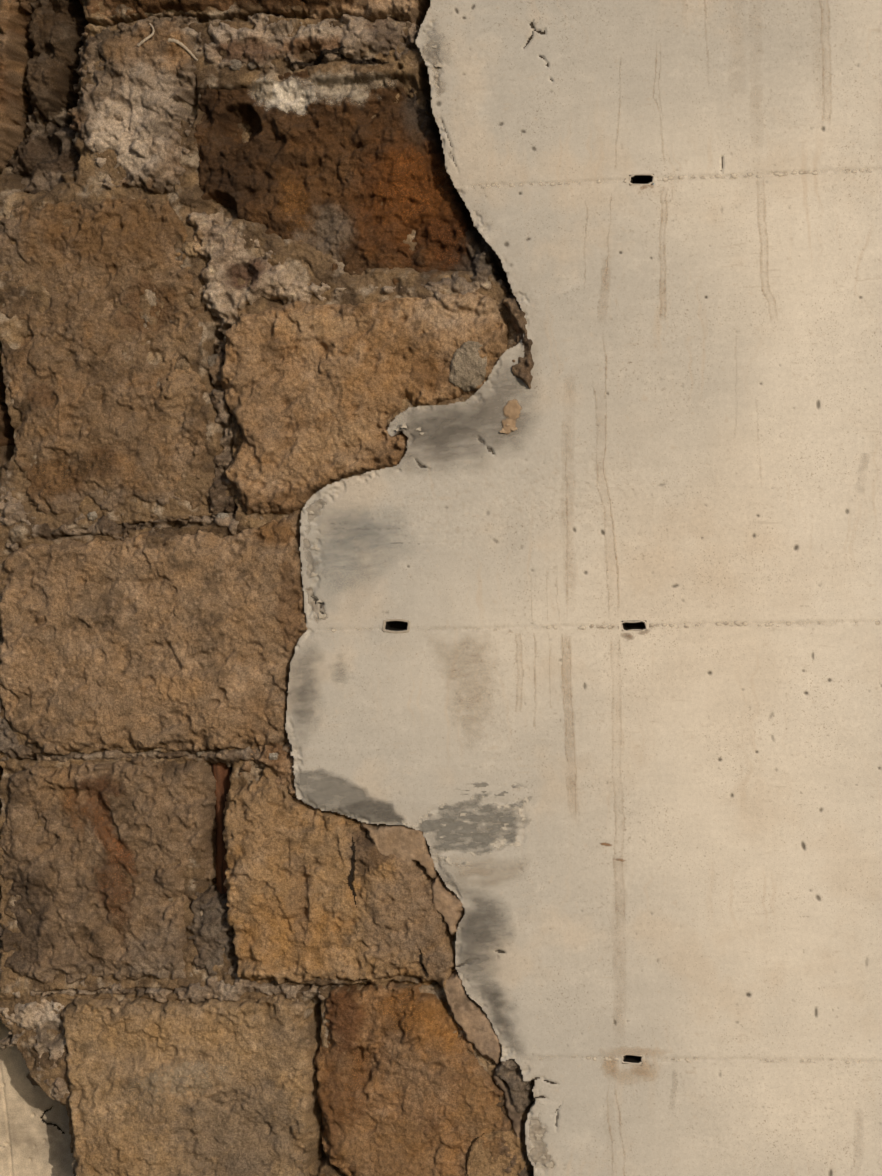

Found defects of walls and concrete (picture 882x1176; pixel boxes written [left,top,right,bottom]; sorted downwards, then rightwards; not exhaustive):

spalling [304,539,326,620]
damp [299,771,403,825]
peeling [357,783,529,936]
damp [464,898,504,1023]
peeling [443,971,554,1176]